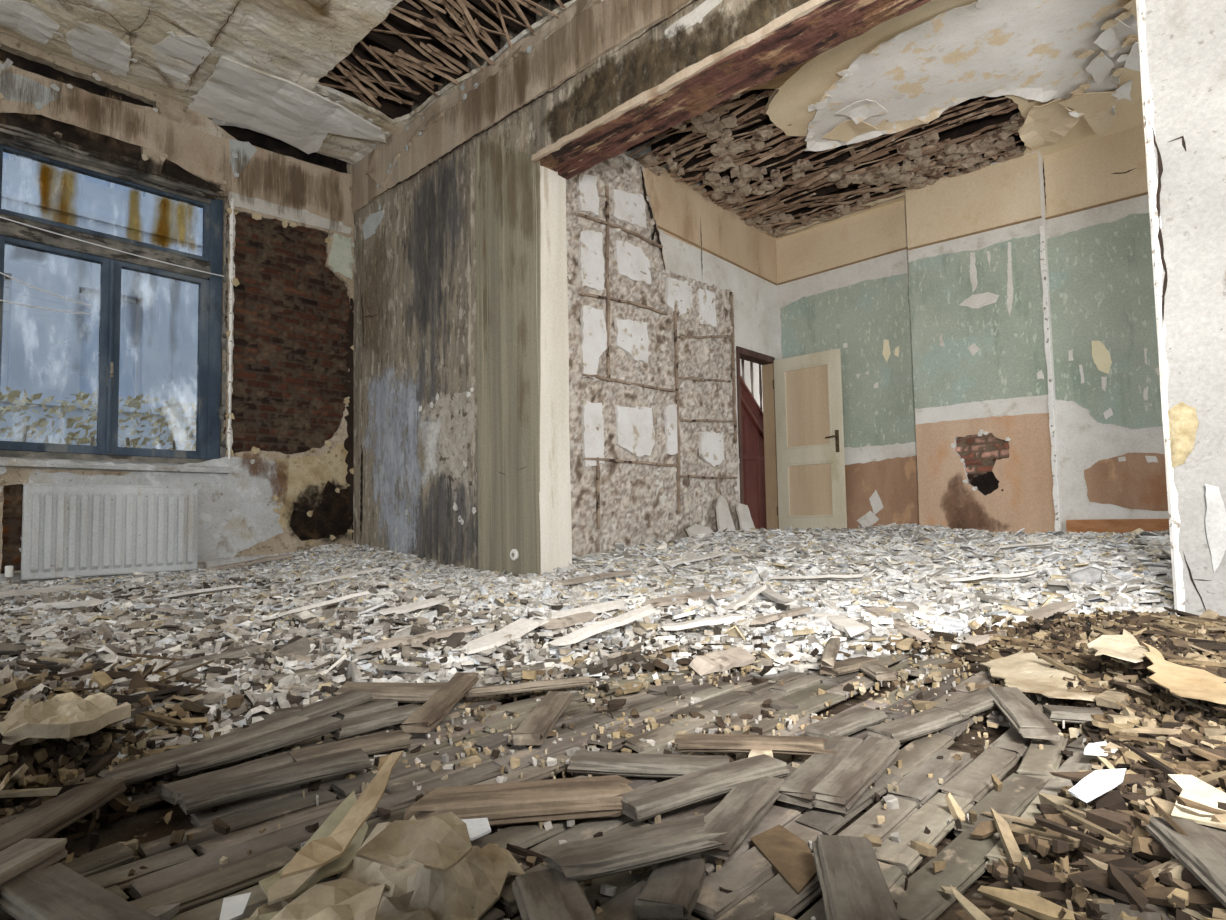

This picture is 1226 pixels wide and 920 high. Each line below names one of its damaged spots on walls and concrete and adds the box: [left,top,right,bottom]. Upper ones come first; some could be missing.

crack [0,58,13,77]
crack [58,0,241,96]
water stain [543,0,815,142]
flaking render [531,0,830,162]
peeling [804,0,1140,152]
corrosion [40,163,75,226]
corrosion [127,190,194,248]
flaking render [0,44,384,574]
water stain [365,153,478,565]
peeling [418,387,477,527]
peeling [857,489,884,527]
flaking render [951,429,1011,496]